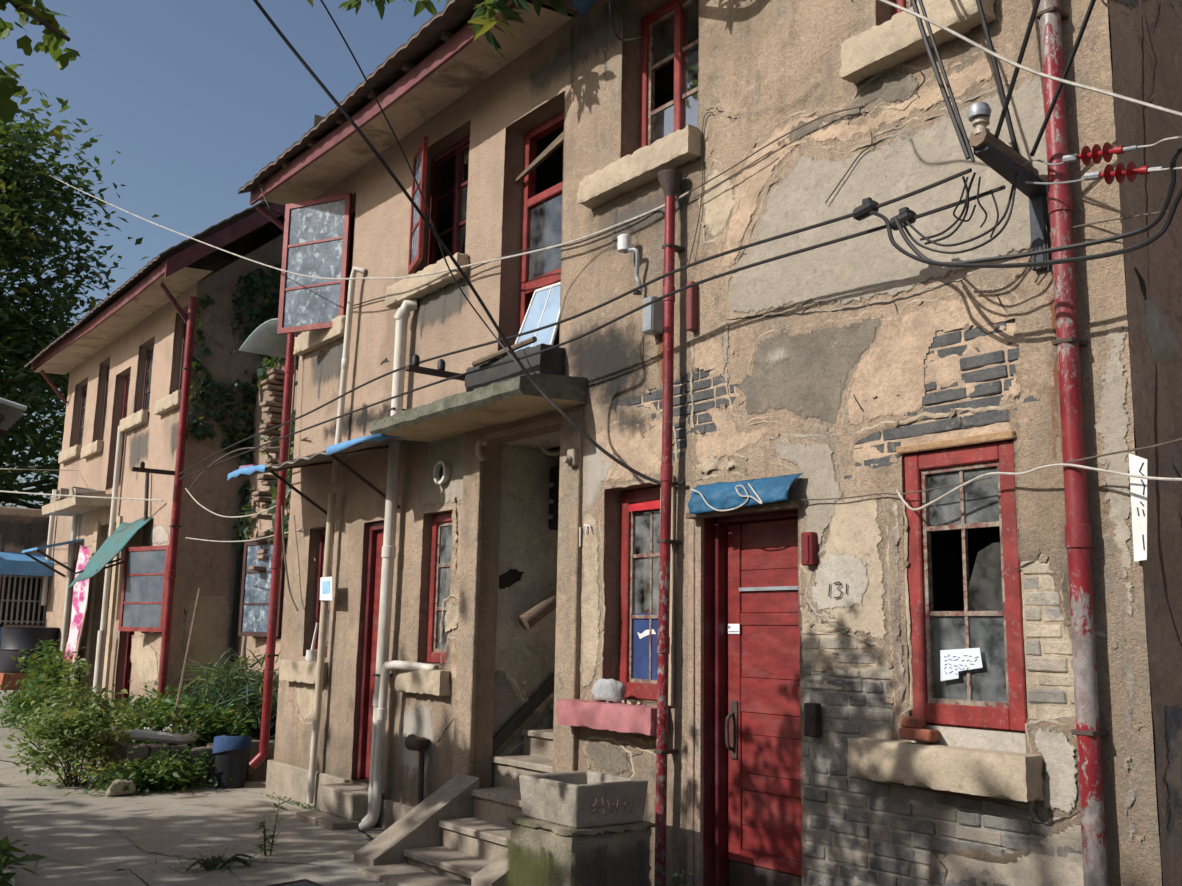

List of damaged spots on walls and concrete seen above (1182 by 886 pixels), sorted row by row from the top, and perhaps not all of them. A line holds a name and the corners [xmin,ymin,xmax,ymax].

crack [1135,4,1161,309]
flaking render [584,45,1084,886]
flaking render [1094,325,1141,615]